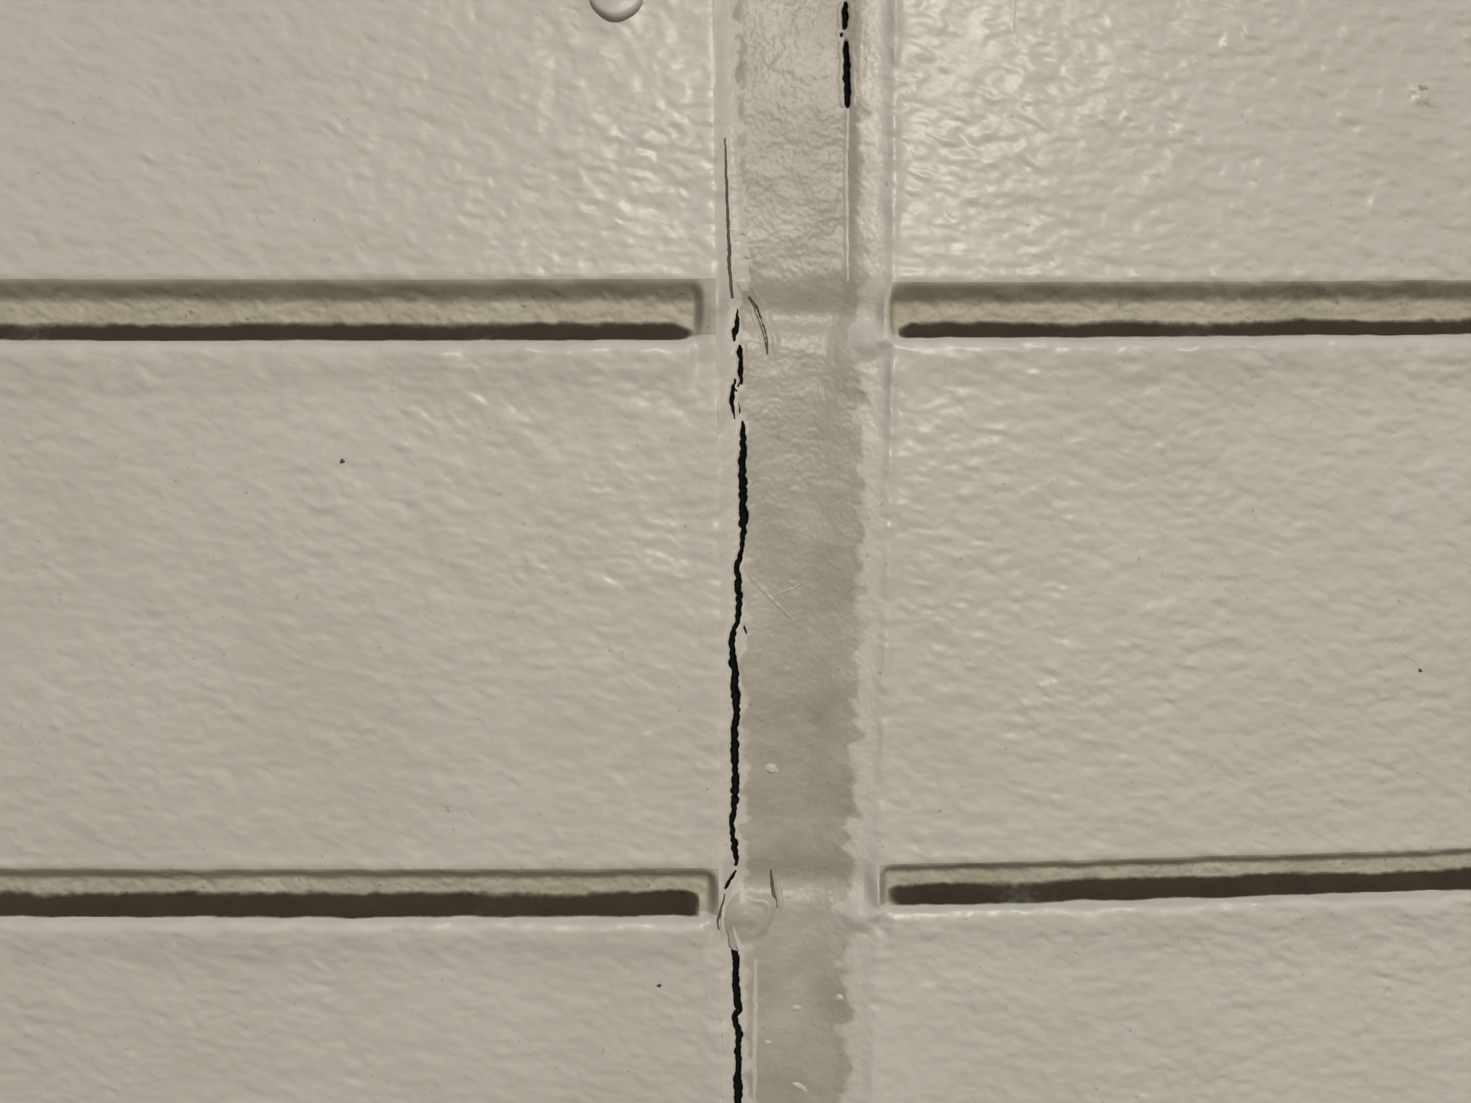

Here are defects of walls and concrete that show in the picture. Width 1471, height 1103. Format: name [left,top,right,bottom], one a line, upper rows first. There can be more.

crack [840,2,851,108]
crack [717,138,751,1103]